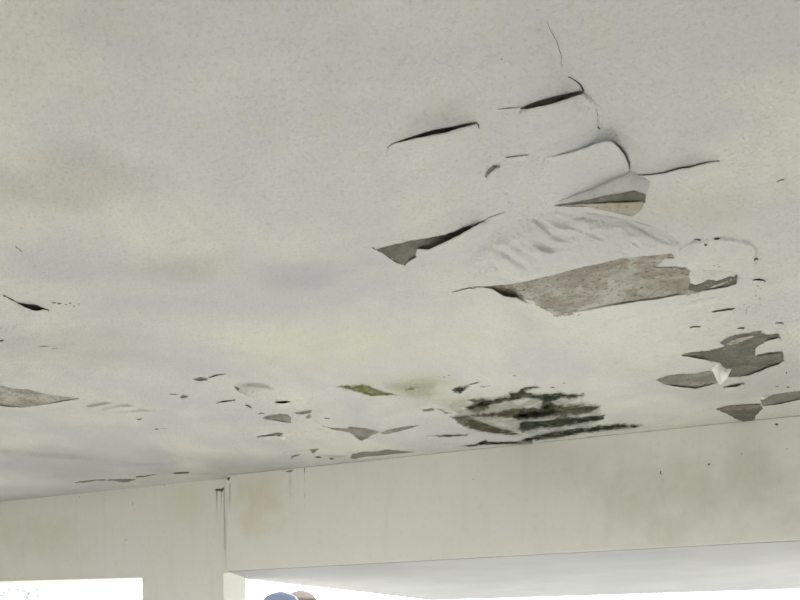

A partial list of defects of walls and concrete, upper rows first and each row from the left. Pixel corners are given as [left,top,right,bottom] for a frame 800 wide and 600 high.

crack [484,23,723,202]
crack [384,114,479,170]
peeling [371,171,750,329]
crack [1,295,51,323]
peeling [658,331,791,395]
peeling [0,379,82,415]
peeling [283,425,419,462]
water stain [423,387,637,447]
peeling [716,391,800,421]